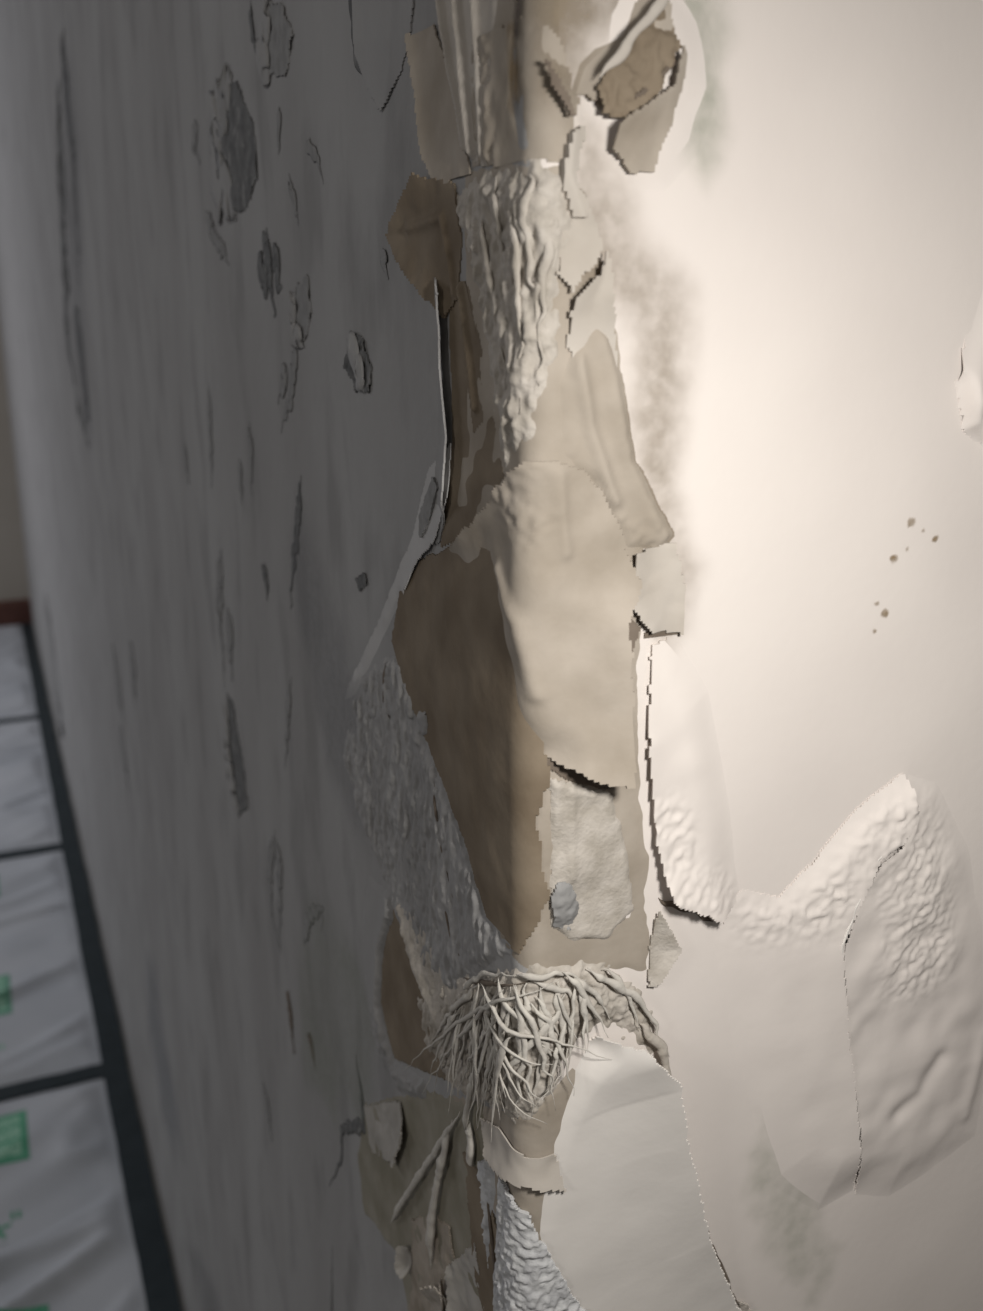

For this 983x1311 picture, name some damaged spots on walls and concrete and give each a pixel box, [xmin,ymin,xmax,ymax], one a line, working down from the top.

spalling [209,62,257,225]
spalling [288,274,312,349]
peeling [343,0,739,990]
peeling [357,1023,741,1311]
crack [731,1291,752,1311]